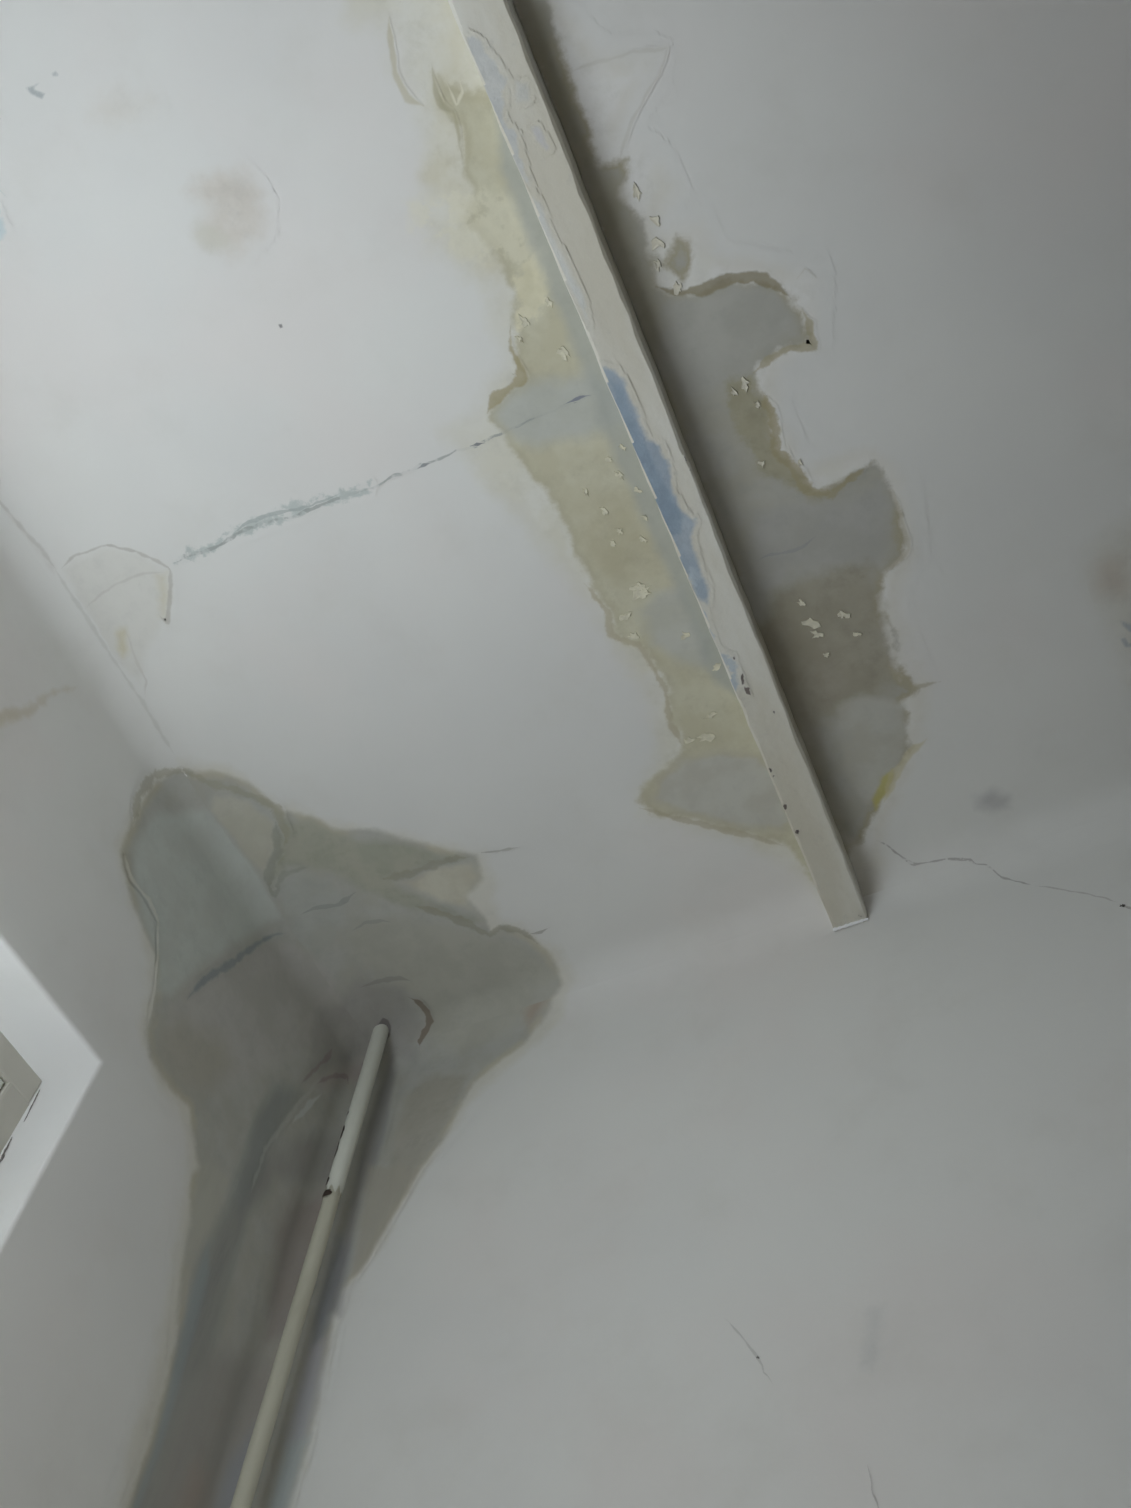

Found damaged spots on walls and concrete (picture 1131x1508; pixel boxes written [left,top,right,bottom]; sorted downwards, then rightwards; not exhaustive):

peeling [462,28,595,331]
crack [167,393,601,573]
water stain [318,0,825,914]
peeling [599,358,743,699]
water stain [512,0,943,897]
water stain [1064,500,1131,720]
crack [872,838,1131,910]
water stain [103,751,584,1508]